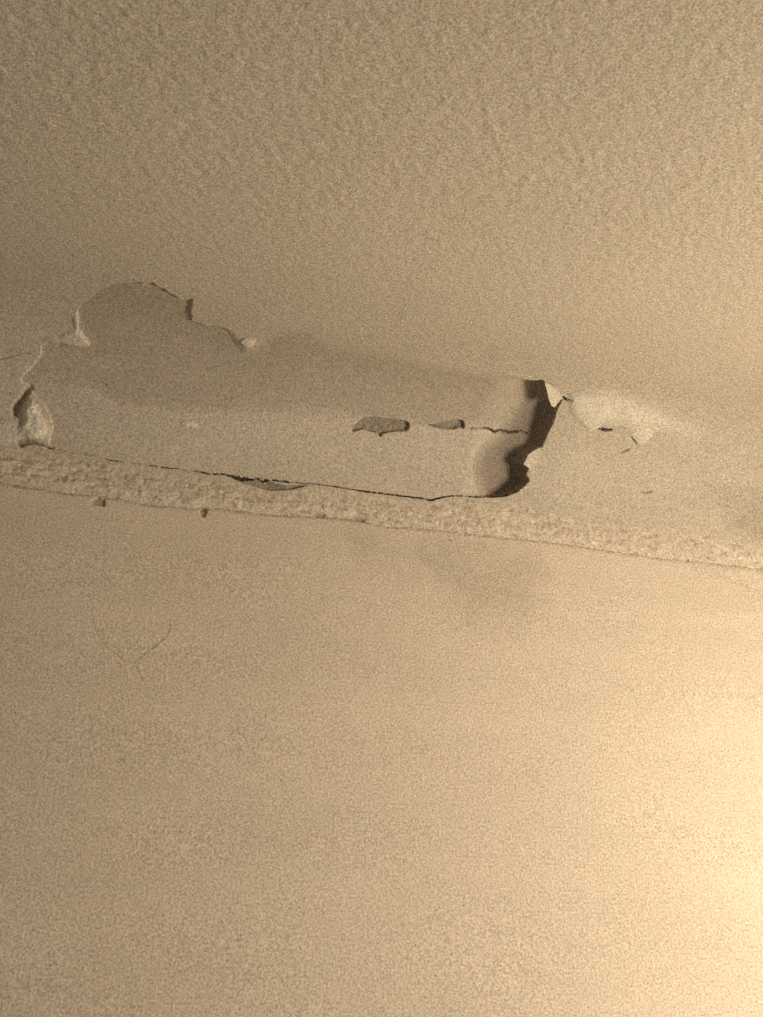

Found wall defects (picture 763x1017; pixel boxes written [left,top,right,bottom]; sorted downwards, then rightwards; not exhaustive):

spalling [19,282,567,500]
crack [149,465,492,501]